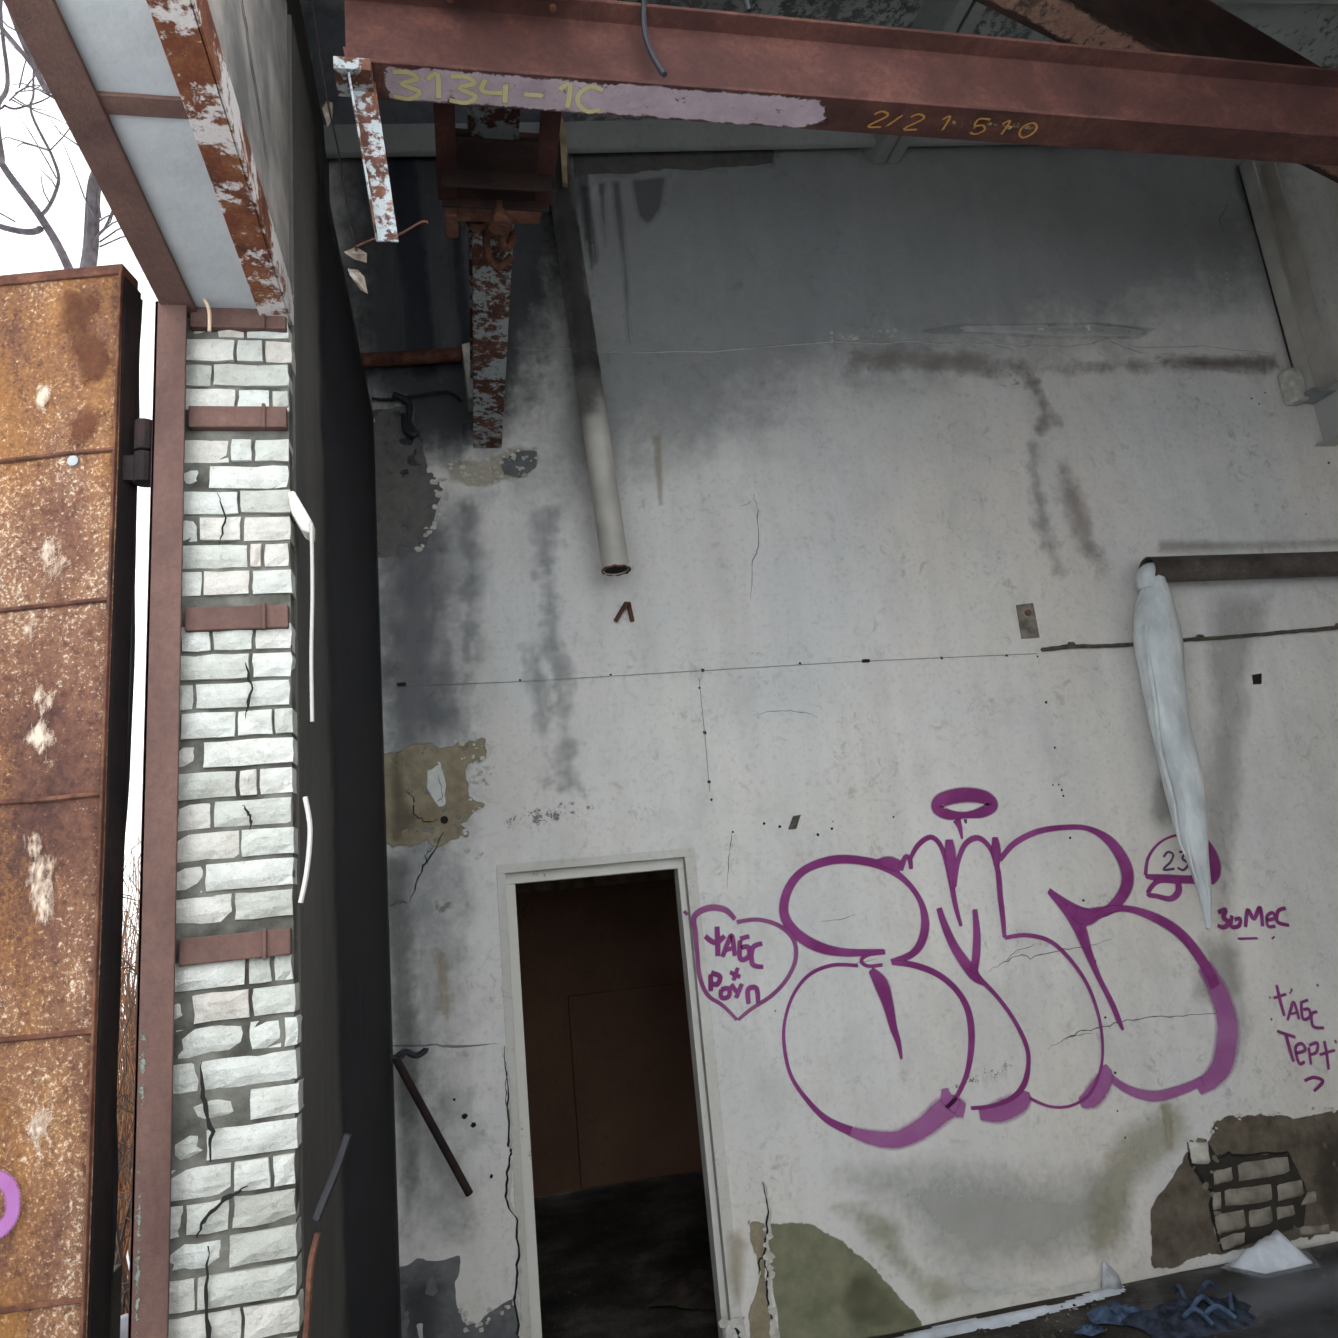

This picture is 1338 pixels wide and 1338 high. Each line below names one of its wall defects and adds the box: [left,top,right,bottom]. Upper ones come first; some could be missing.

flaking render [372,405,539,558]
water stain [378,534,462,753]
peeling [384,737,495,859]
crack [200,1061,216,1162]
crack [196,1185,248,1338]
crack [394,1043,523,1338]
flaking render [399,1256,518,1338]
crack [757,1182,779,1335]
spalling [1150,1107,1338,1268]